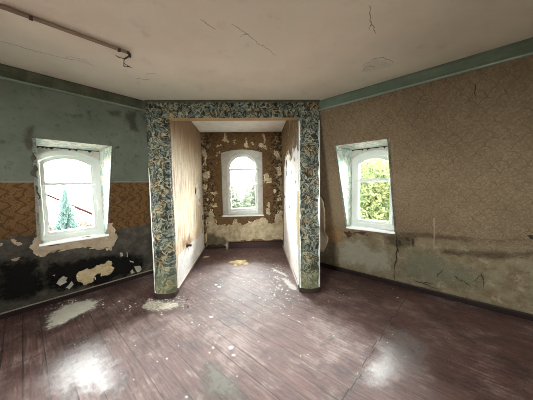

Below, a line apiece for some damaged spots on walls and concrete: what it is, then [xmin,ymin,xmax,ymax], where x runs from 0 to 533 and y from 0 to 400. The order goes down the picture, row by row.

flaking render [29,223,118,257]
spalling [52,261,114,289]